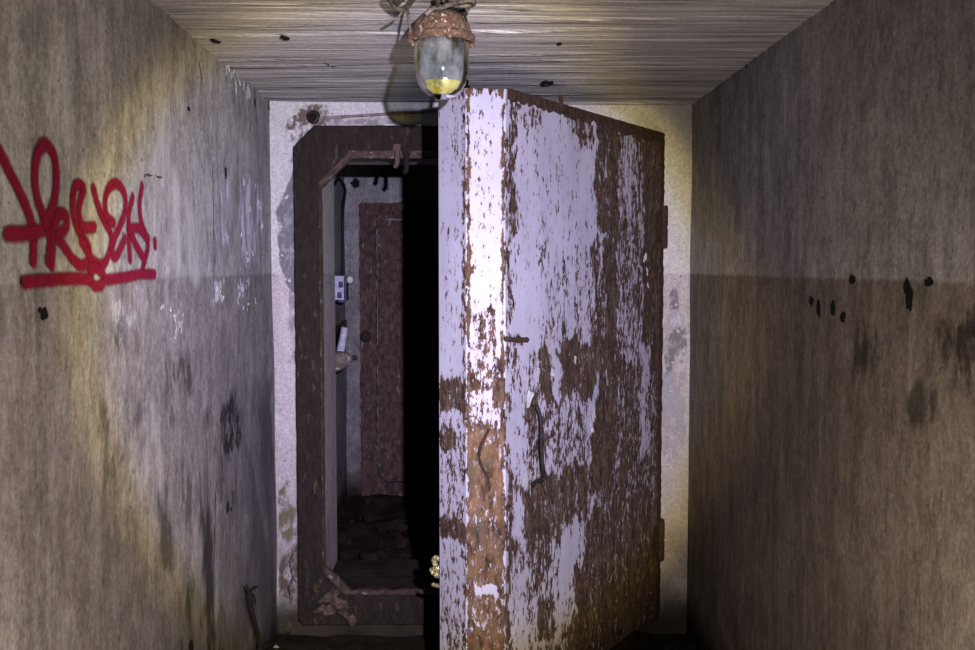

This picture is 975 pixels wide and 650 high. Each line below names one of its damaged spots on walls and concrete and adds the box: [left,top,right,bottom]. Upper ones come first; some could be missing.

leakage [220,394,241,485]
rust [477,428,491,484]